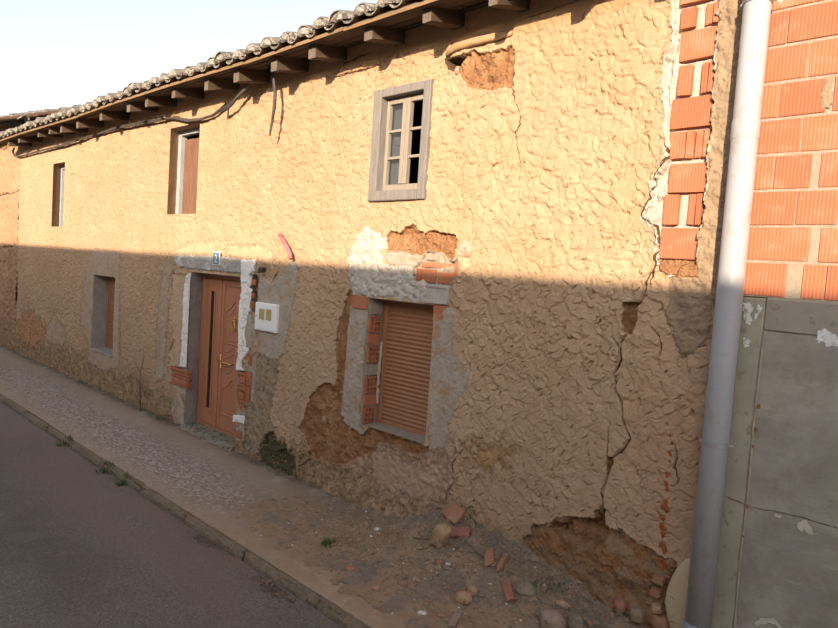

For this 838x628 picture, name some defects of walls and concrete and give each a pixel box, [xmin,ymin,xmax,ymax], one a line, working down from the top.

crack [338,53,375,77]
flaking render [445,30,515,90]
crack [512,62,521,178]
flaking render [640,0,721,278]
flaking render [386,223,471,290]
crack [641,141,671,291]
flaking render [232,259,259,441]
flaking render [299,289,429,466]
crack [593,334,631,453]
flaking render [523,505,677,628]